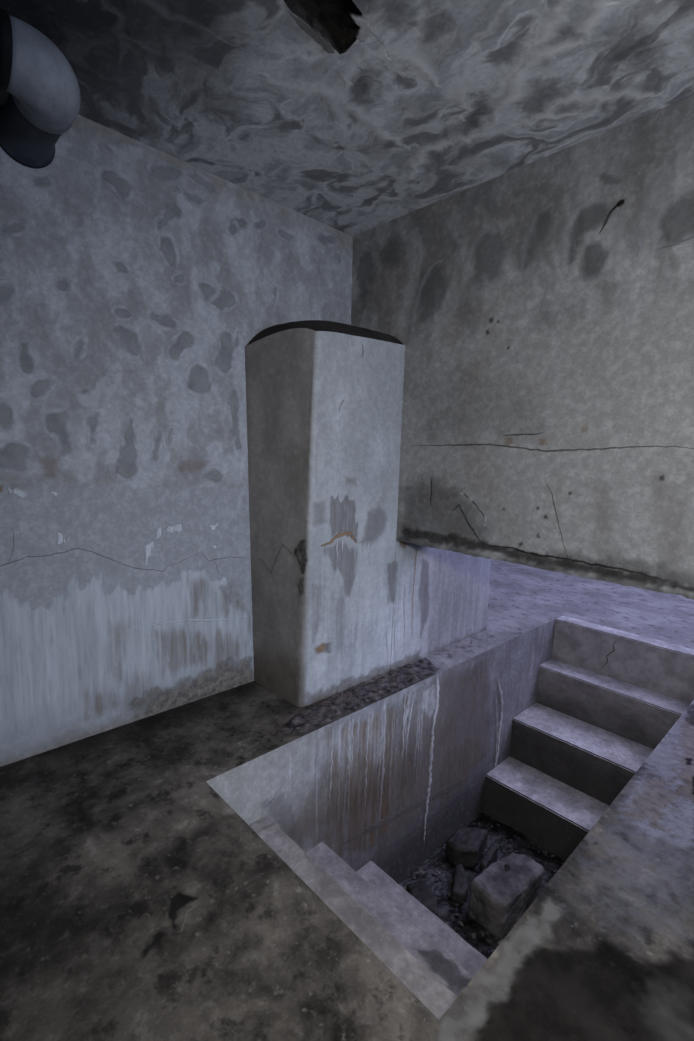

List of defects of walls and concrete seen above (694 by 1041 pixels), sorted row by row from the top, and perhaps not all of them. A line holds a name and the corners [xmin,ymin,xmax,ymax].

spalling [288,2,334,53]
spalling [351,16,370,42]
crack [599,199,624,234]
crack [419,433,694,452]
crack [1,529,295,591]
peeling [145,524,182,566]
corrosion [322,532,369,594]
peeling [0,570,251,735]
damp [394,677,440,841]
damp [476,944,694,1041]